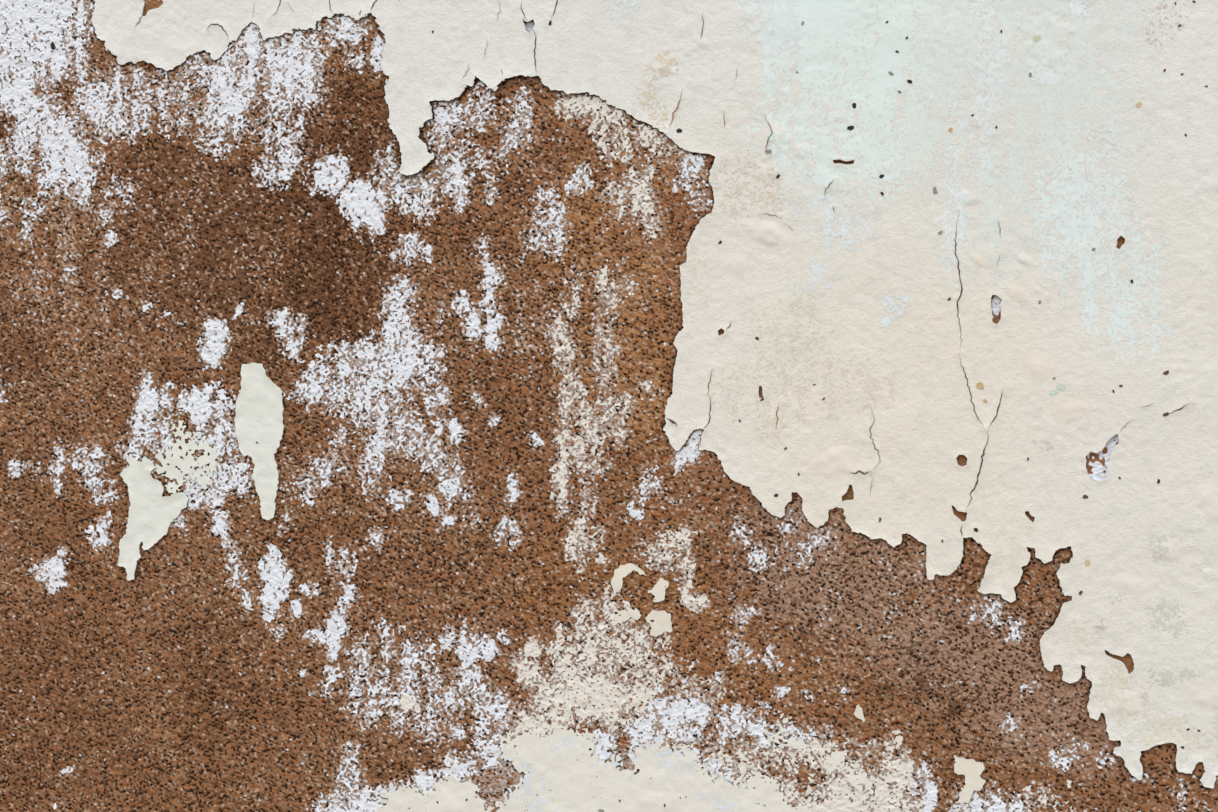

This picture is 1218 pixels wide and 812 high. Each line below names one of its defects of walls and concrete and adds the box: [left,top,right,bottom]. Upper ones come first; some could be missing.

spalling [142,0,164,16]
spalling [0,21,27,70]
spalling [15,19,58,57]
crack [462,0,558,79]
spalling [523,20,552,33]
spalling [991,295,1002,324]
crack [955,224,1003,538]
spalling [1086,434,1121,482]
spalling [842,485,854,501]
spalling [952,505,967,521]
spalling [1105,650,1134,674]